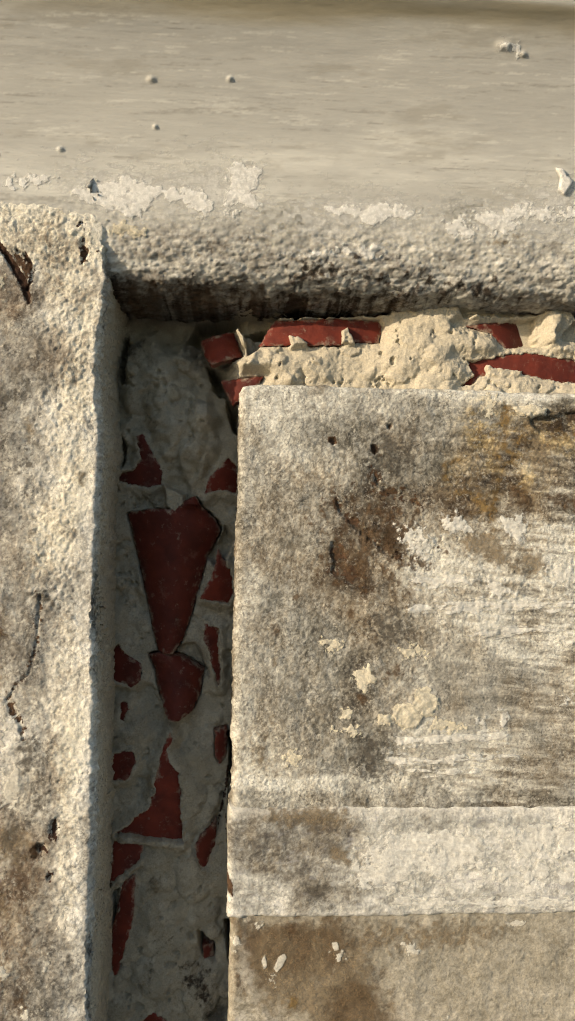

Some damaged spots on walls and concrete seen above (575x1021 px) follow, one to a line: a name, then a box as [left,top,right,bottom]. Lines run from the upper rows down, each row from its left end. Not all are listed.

peeling [5,148,575,271]
crack [0,242,33,304]
damp [233,916,526,1021]